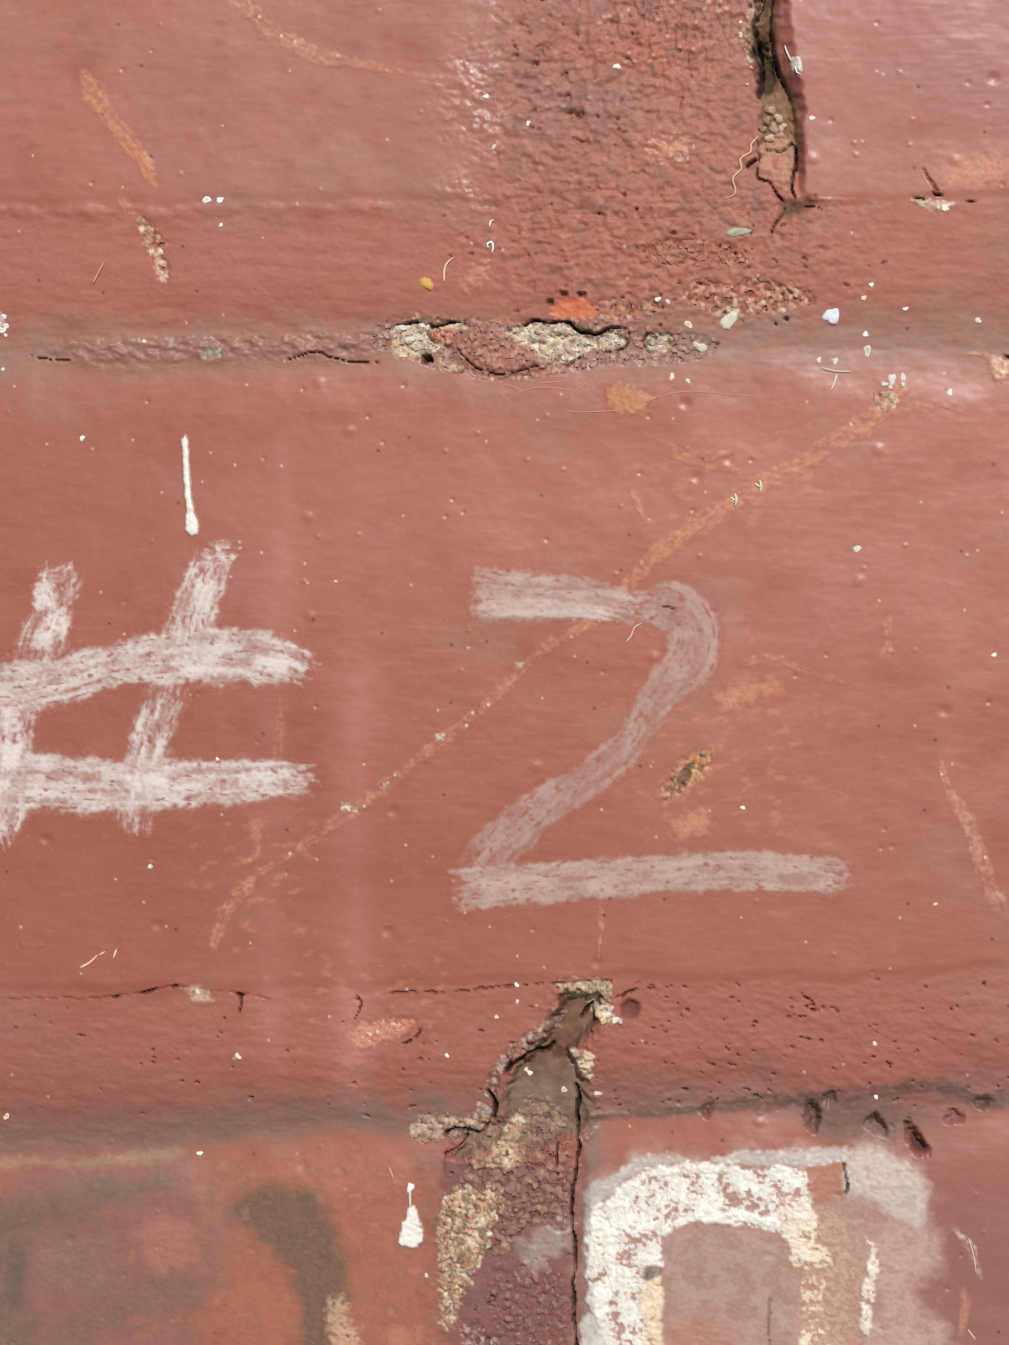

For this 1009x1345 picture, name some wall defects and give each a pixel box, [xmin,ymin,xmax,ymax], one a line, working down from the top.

crack [738,0,823,237]
peeling [369,228,839,382]
crack [442,1124,472,1157]
spalling [405,976,623,1345]
crack [555,1081,582,1246]
peeling [804,1159,850,1205]
crack [570,1279,578,1345]
peeling [642,1262,665,1282]